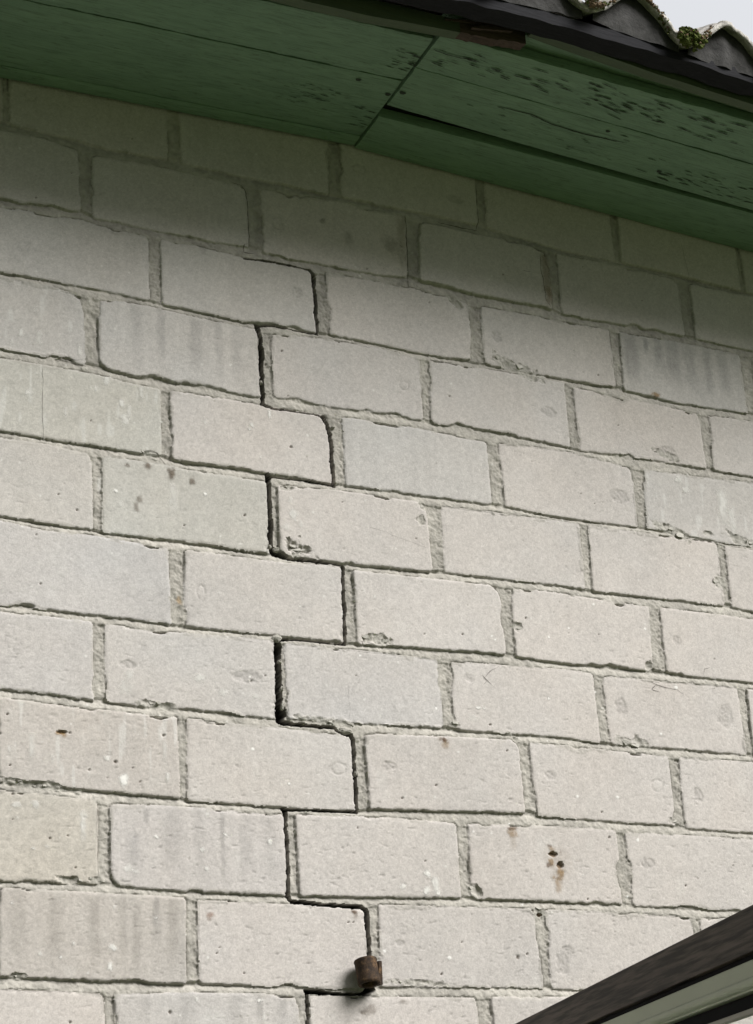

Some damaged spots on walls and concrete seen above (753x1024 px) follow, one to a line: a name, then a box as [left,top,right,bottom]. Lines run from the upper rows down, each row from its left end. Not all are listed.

crack [234,183,372,956]
crack [303,987,376,1024]